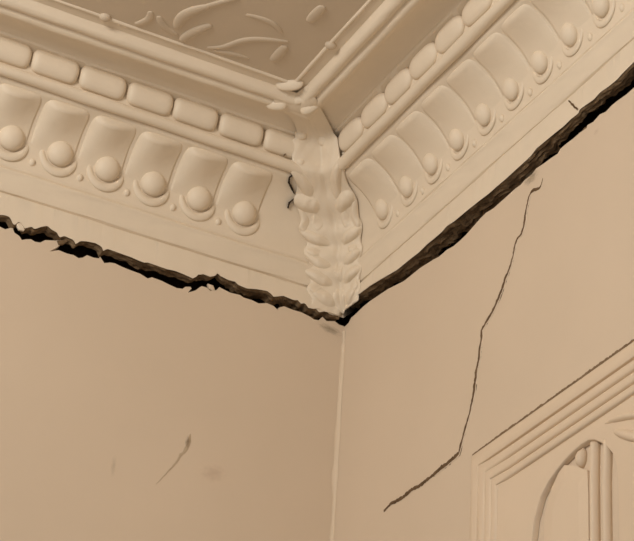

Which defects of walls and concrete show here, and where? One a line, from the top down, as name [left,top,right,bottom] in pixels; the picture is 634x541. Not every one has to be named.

crack [0,63,634,327]
crack [384,178,543,512]